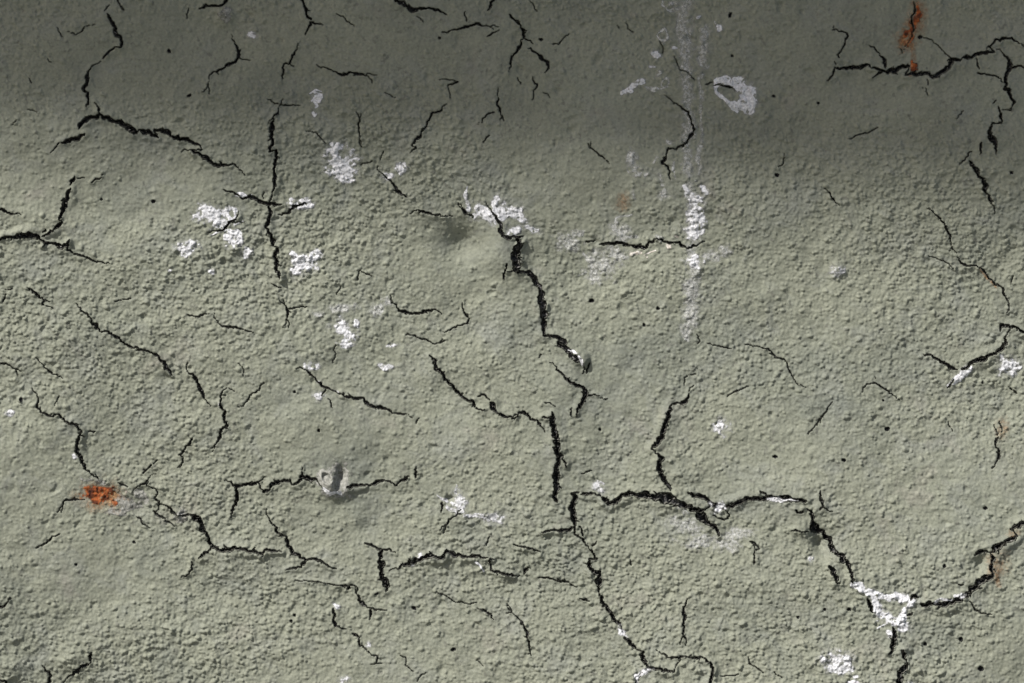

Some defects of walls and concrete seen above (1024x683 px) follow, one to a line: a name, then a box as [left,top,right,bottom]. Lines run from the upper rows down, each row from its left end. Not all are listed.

crack [828,4,1024,210]
crack [54,0,318,328]
damp [323,142,360,183]
damp [557,0,732,340]
damp [192,192,252,259]
damp [463,186,539,235]
crack [0,115,873,683]
damp [947,366,972,387]
damp [998,355,1022,377]
corrosion [79,485,118,507]
damp [850,582,916,637]
crack [889,522,1024,683]